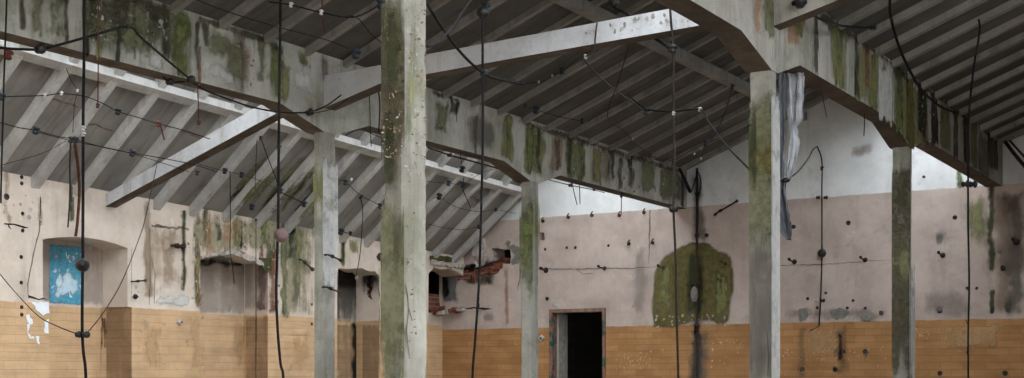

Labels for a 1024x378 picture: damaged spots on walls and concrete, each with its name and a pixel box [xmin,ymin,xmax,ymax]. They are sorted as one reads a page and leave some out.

damp [86,0,278,87]
damp [814,13,873,98]
damp [433,91,460,131]
damp [527,123,541,172]
damp [555,137,635,190]
damp [748,113,756,185]
damp [893,68,958,159]
damp [182,209,311,317]
spalling [457,252,511,283]
damp [987,187,1023,313]